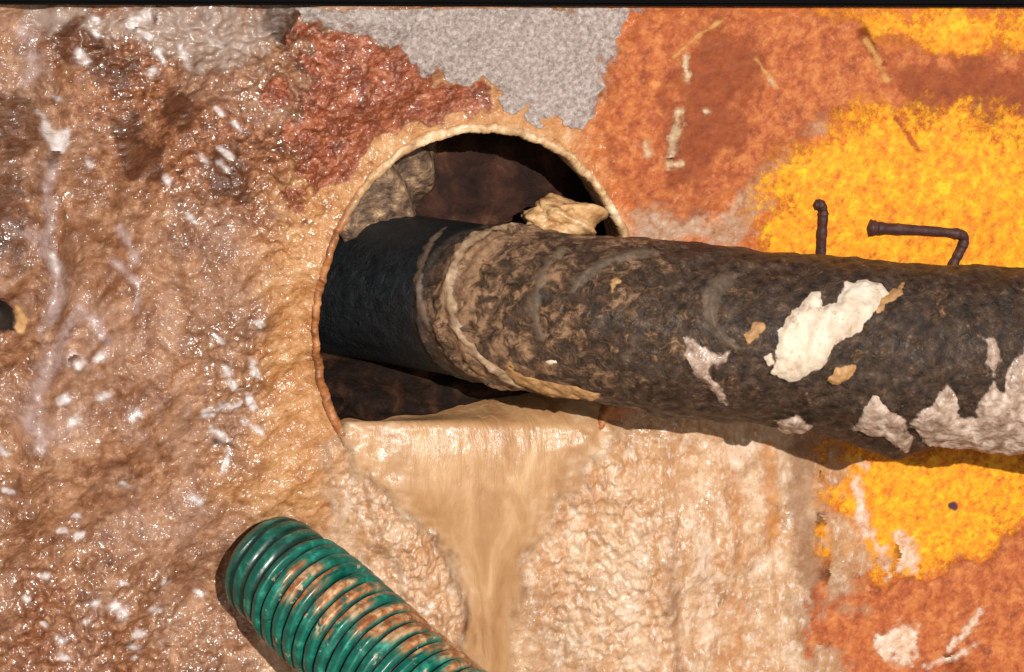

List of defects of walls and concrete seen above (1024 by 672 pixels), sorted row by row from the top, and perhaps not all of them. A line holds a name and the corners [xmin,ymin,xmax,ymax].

water stain [21,52,38,84]
water stain [41,114,69,153]
water stain [200,147,234,172]
rust [259,5,495,224]
spalling [295,7,643,130]
rust [598,6,1024,222]
water stain [13,163,111,453]
water stain [111,224,140,312]
water stain [201,366,256,472]
water stain [250,360,260,378]
rust [800,527,1024,672]